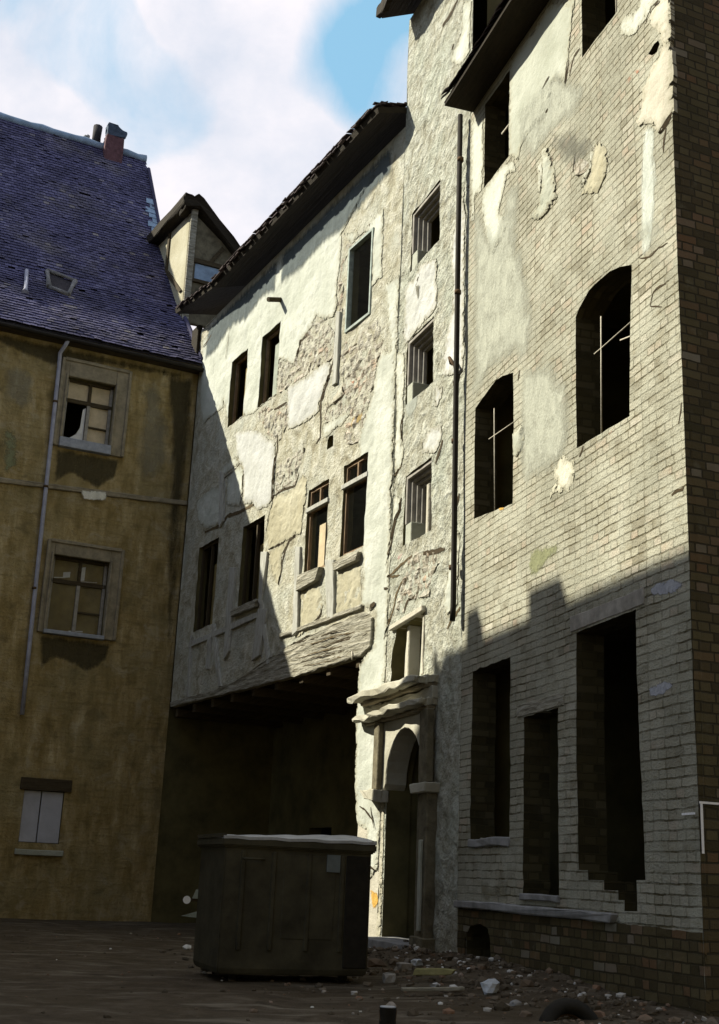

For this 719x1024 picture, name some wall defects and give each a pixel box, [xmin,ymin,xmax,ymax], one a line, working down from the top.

flaking render [434,0,575,407]
flaking render [620,0,678,132]
flaking render [196,209,460,937]